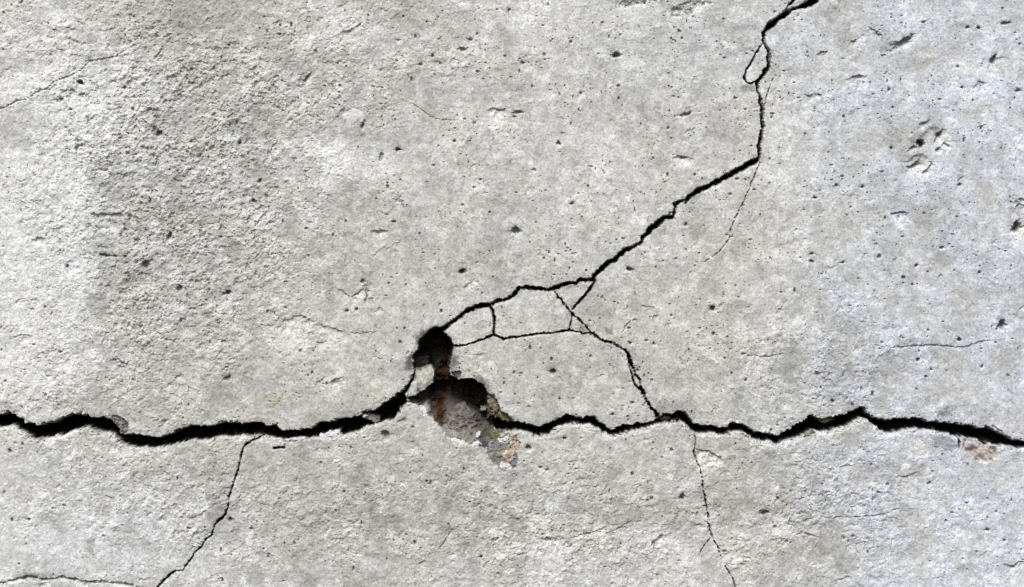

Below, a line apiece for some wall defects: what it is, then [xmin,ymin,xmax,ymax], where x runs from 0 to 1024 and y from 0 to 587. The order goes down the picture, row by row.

crack [0,48,128,110]
crack [411,102,459,122]
crack [438,0,1024,587]
spalling [412,326,455,371]
corrosion [428,351,453,426]
spalling [406,371,521,475]
crack [0,371,415,587]